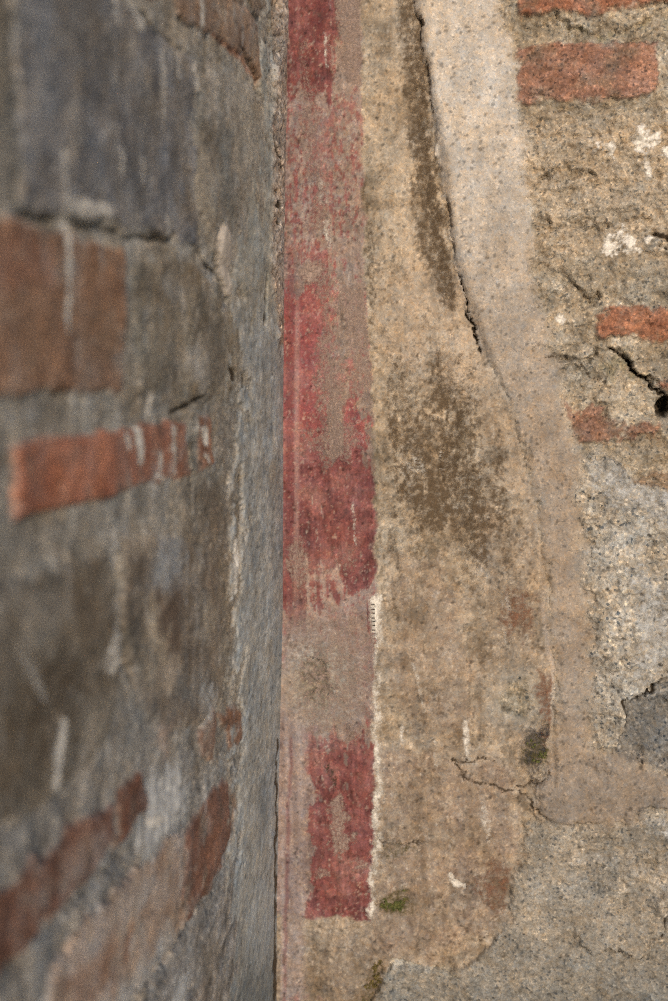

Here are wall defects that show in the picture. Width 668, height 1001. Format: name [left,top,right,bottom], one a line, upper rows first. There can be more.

damp [400,2,456,310]
crack [460,281,481,353]
crack [609,348,666,398]
spalling [616,677,668,772]
crack [451,756,551,815]